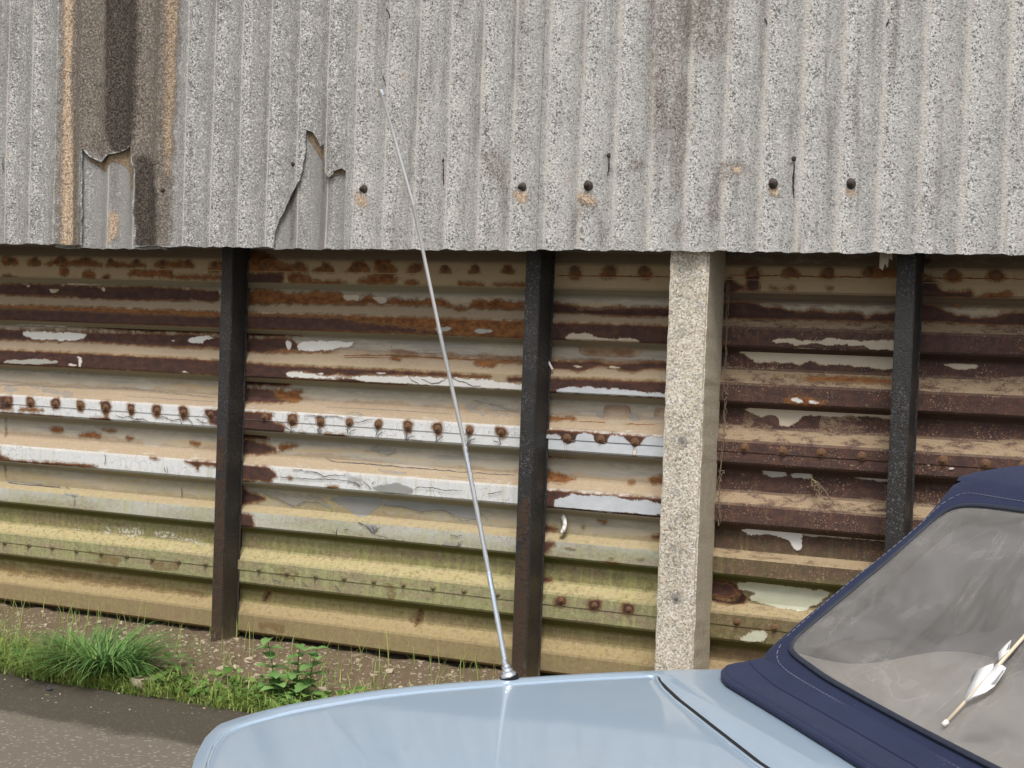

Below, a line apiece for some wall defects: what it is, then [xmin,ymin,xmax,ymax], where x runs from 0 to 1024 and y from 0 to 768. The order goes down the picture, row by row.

damp [55,0,181,245]
corrosion [0,256,222,376]
corrosion [552,301,669,344]
peeling [4,356,82,367]
corrosion [241,250,525,528]
corrosion [550,359,667,399]
peeling [739,337,894,370]
peeling [745,393,890,427]
peeling [554,492,661,534]
peeling [741,529,885,551]
corrosion [712,579,748,606]
peeling [737,582,830,612]